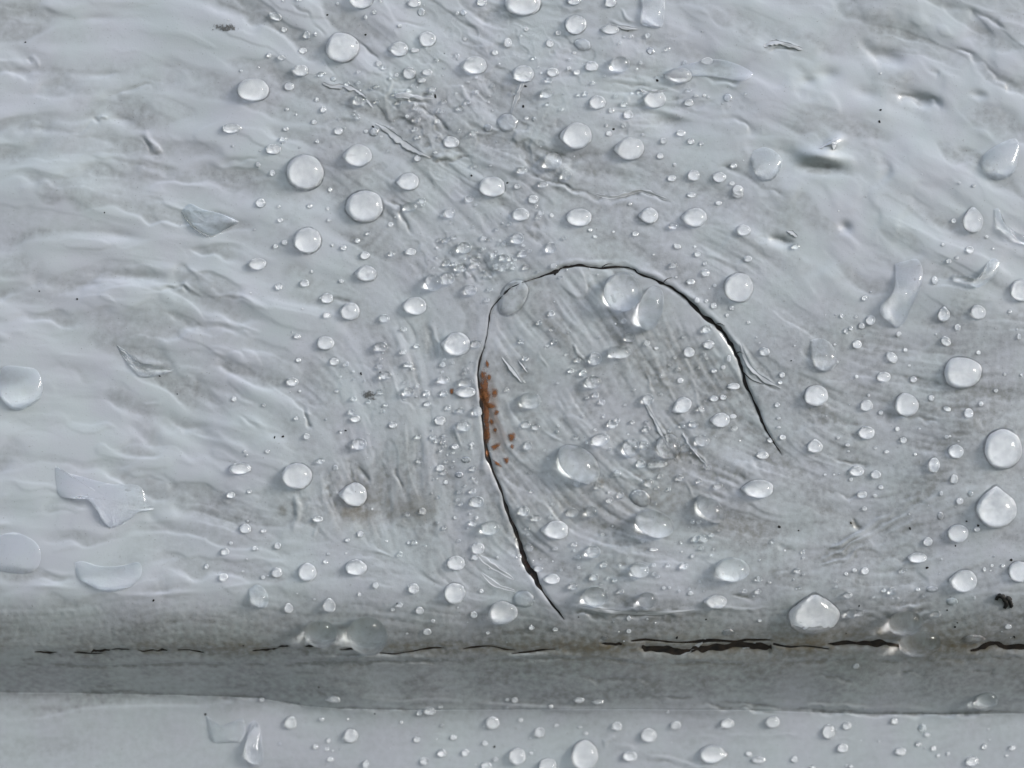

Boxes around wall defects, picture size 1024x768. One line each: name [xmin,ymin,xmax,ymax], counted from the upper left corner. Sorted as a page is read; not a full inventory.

crack [528,263,781,453]
rust [480,361,515,467]
crack [477,300,564,619]
crack [36,647,204,655]
crack [253,644,314,652]
crack [380,645,553,654]
crack [602,638,899,655]
crack [970,641,1024,651]